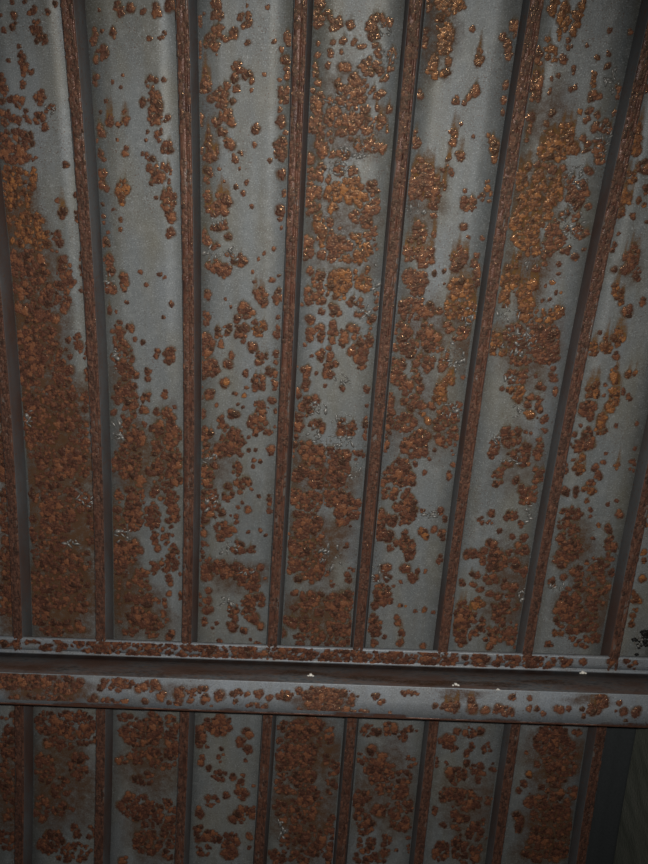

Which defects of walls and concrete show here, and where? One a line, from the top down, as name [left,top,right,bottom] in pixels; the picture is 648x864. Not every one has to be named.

corrosion [0,0,648,674]
corrosion [0,673,418,864]
corrosion [400,681,648,864]